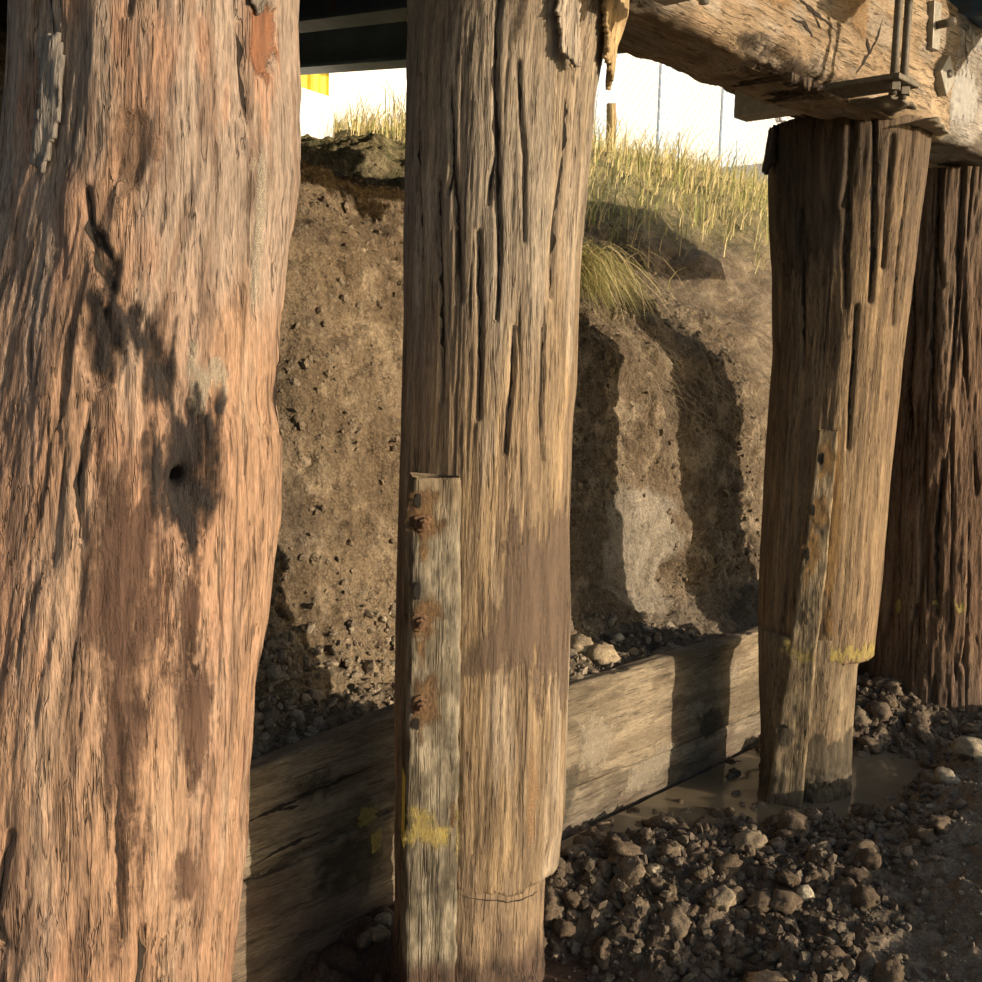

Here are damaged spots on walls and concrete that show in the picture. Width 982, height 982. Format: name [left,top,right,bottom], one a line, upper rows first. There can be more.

crack [791,0,838,37]
crack [856,20,883,75]